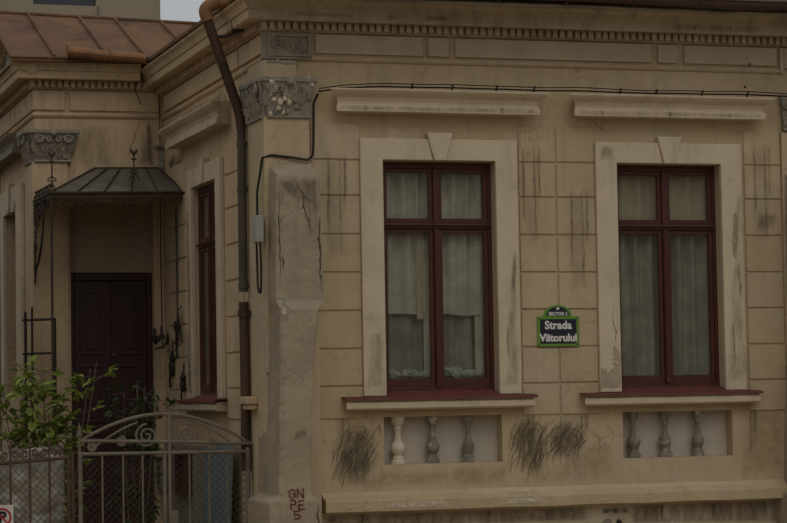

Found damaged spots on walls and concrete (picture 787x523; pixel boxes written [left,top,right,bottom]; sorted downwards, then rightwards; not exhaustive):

peeling [600,346,621,388]